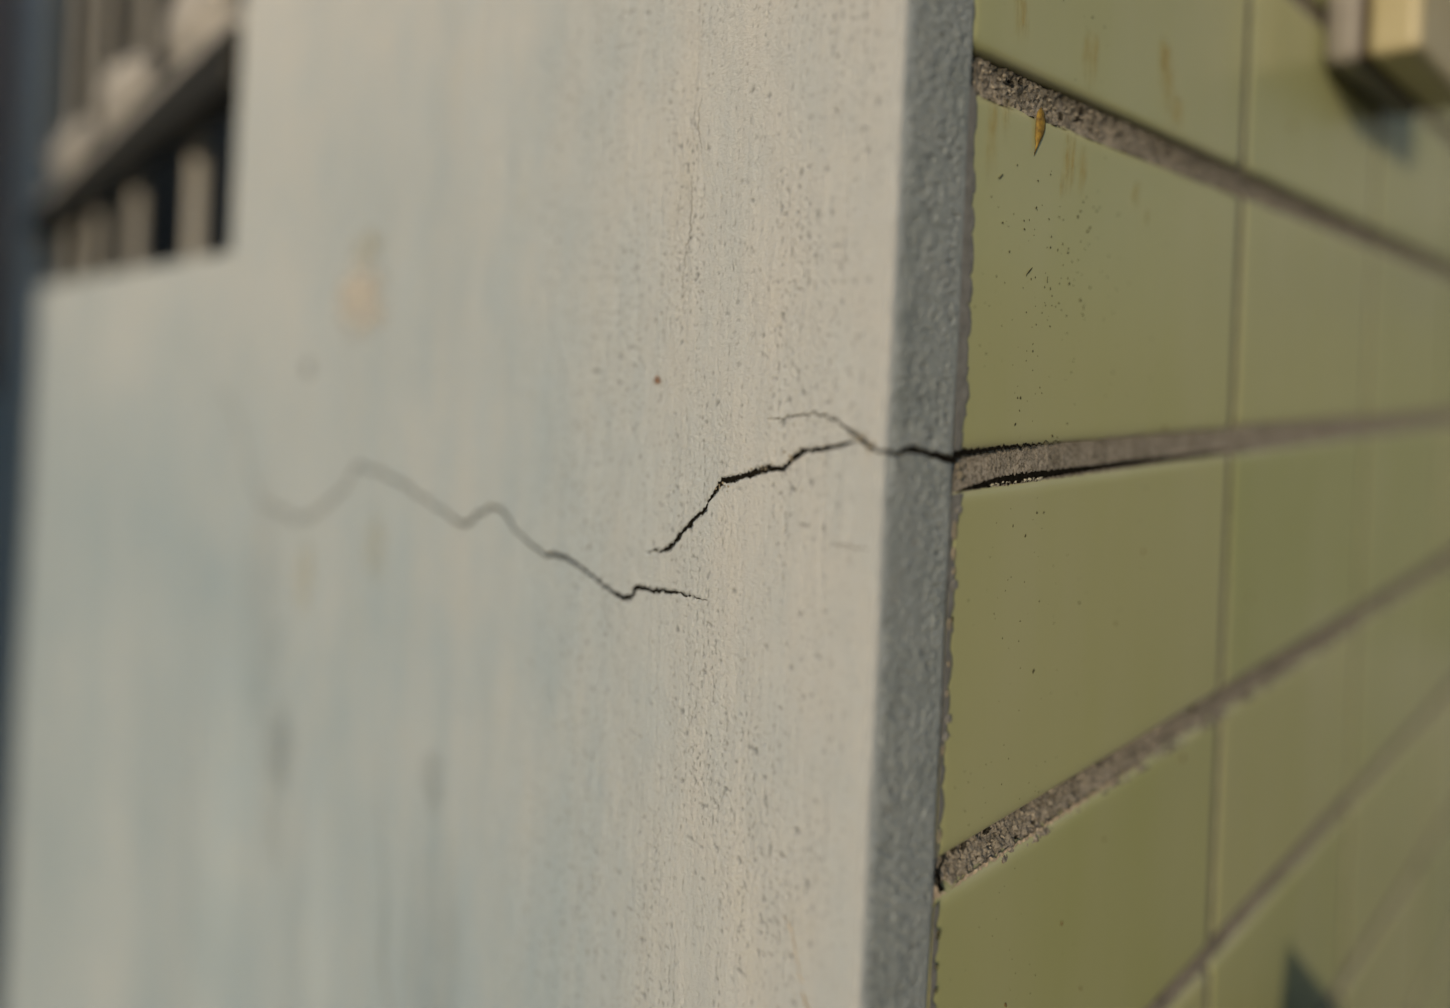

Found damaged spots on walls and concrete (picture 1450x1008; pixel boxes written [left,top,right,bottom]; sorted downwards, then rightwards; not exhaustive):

crack [218,387,1229,601]